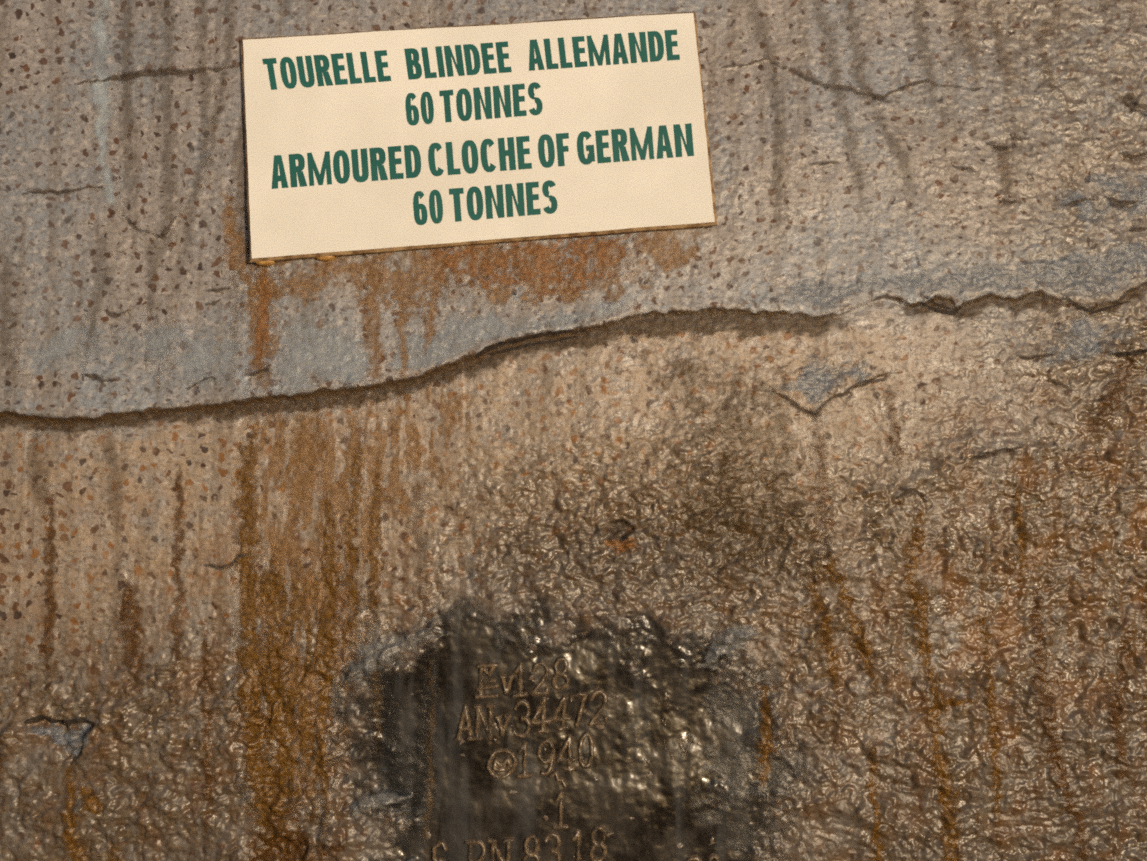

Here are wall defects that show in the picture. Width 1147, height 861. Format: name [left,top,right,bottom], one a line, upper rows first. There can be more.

crack [75,65,234,84]
crack [722,56,984,102]
crack [0,307,844,432]
rust [222,195,699,383]
crack [775,371,891,417]
crack [875,282,1147,319]
rust [43,508,58,688]
rust [171,474,185,685]
rust [234,382,472,861]
rust [808,554,878,686]
rust [901,510,1004,861]
damp [692,686,791,853]